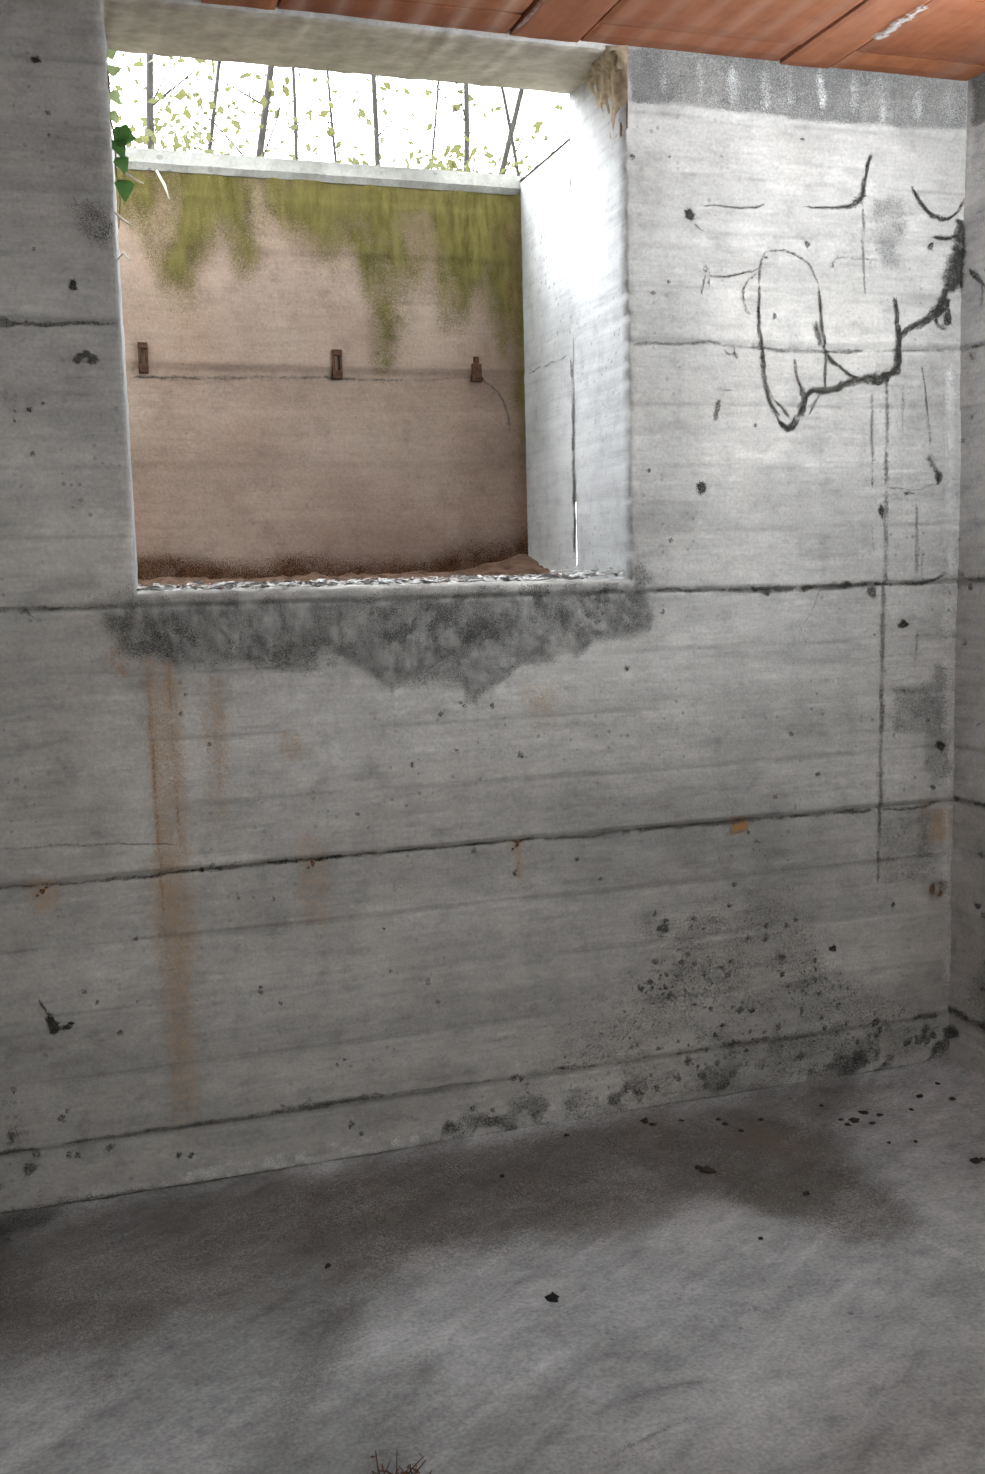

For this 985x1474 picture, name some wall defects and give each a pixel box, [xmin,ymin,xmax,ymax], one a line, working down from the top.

crack [807,154,873,210]
crack [637,186,985,496]
damp [0,364,985,1449]